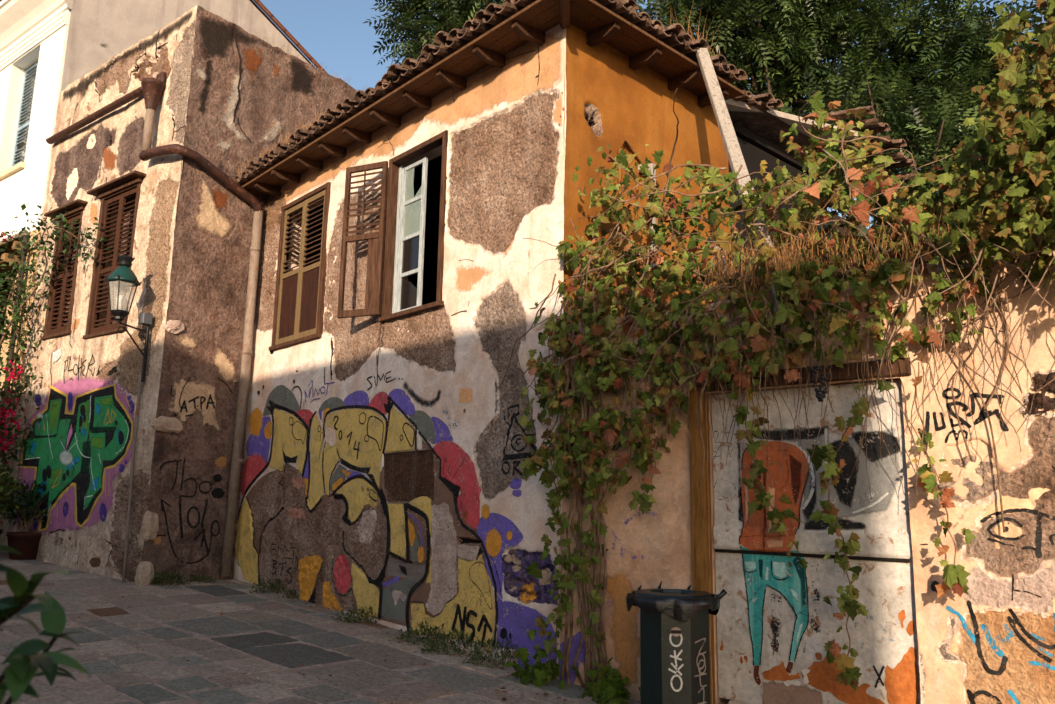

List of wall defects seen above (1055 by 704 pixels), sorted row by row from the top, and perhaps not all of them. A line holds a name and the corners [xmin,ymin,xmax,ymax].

peeling [219,75,246,151]
crack [233,23,251,142]
flaking render [254,34,564,333]
flaking render [323,191,456,382]
flaking render [472,280,538,502]
flaking render [251,449,481,622]
flaking render [931,370,1055,704]
peeling [740,610,926,704]